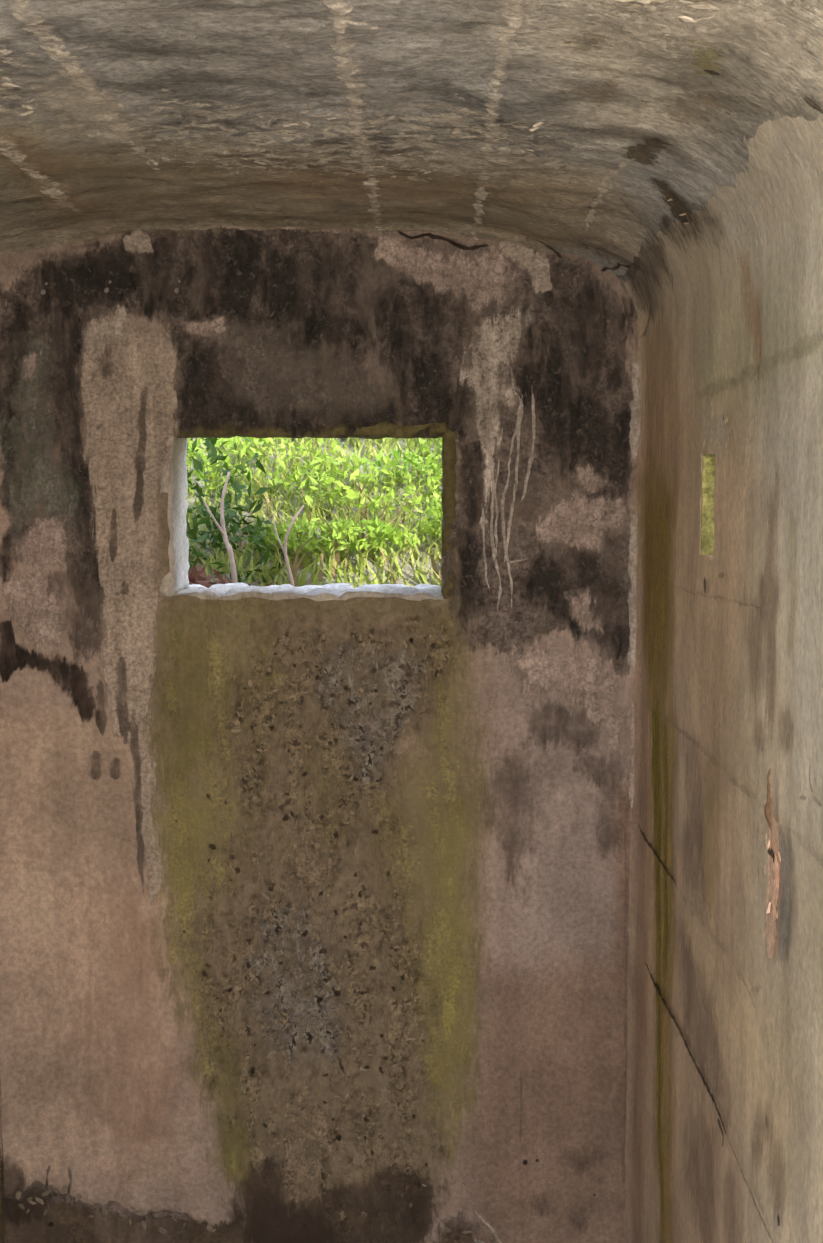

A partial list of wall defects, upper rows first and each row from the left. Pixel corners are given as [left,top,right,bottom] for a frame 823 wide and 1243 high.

leakage [0,202,721,898]
leakage [0,1158,502,1243]
crack [638,824,676,884]
leakage [652,704,720,1243]
crack [646,964,769,1233]
spalling [761,768,791,961]